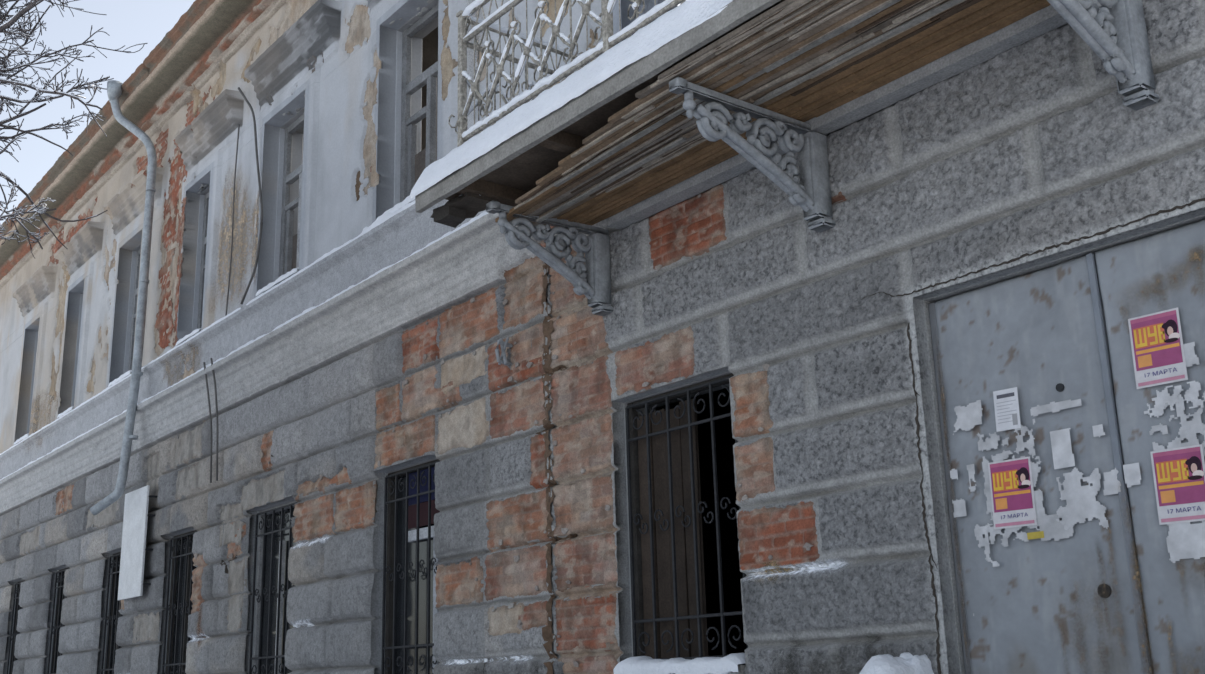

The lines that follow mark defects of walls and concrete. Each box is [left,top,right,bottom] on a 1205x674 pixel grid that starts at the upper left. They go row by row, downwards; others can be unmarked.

peeling [241,0,317,83]
peeling [306,52,324,73]
peeling [345,5,381,201]
peeling [440,0,458,101]
peeling [538,0,569,37]
peeling [586,29,598,62]
spalling [131,60,226,356]
spalling [648,184,727,271]
spalling [219,226,695,674]
crack [536,262,577,674]
spalling [730,364,820,572]
crack [861,198,1205,674]